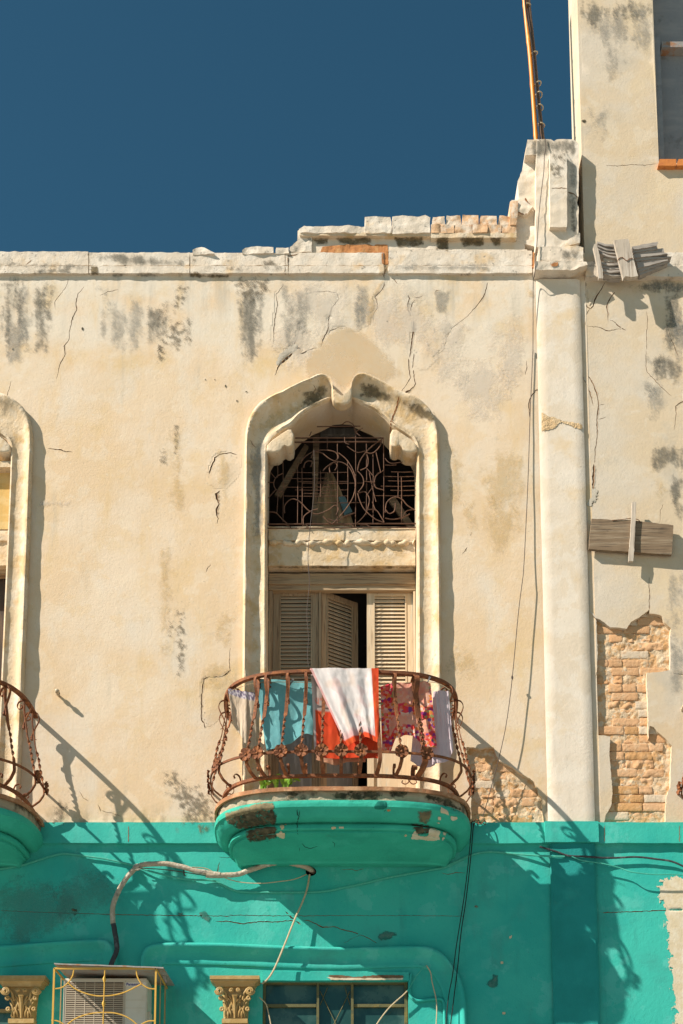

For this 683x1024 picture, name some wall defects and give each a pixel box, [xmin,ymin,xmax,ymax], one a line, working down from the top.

water stain [583,2,648,36]
crack [54,282,115,376]
water stain [113,287,191,360]
water stain [236,279,268,358]
crack [273,254,339,375]
crack [582,282,683,428]
water stain [643,281,683,348]
spalling [542,413,582,431]
crack [208,440,255,523]
water stain [671,480,682,510]
crack [201,652,231,728]
peeling [656,876,683,1024]